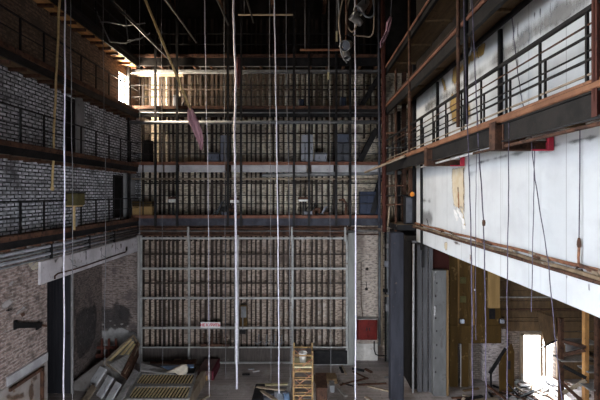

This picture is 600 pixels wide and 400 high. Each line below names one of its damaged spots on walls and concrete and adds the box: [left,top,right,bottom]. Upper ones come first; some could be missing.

damp [494,0,584,63]
damp [76,304,97,359]